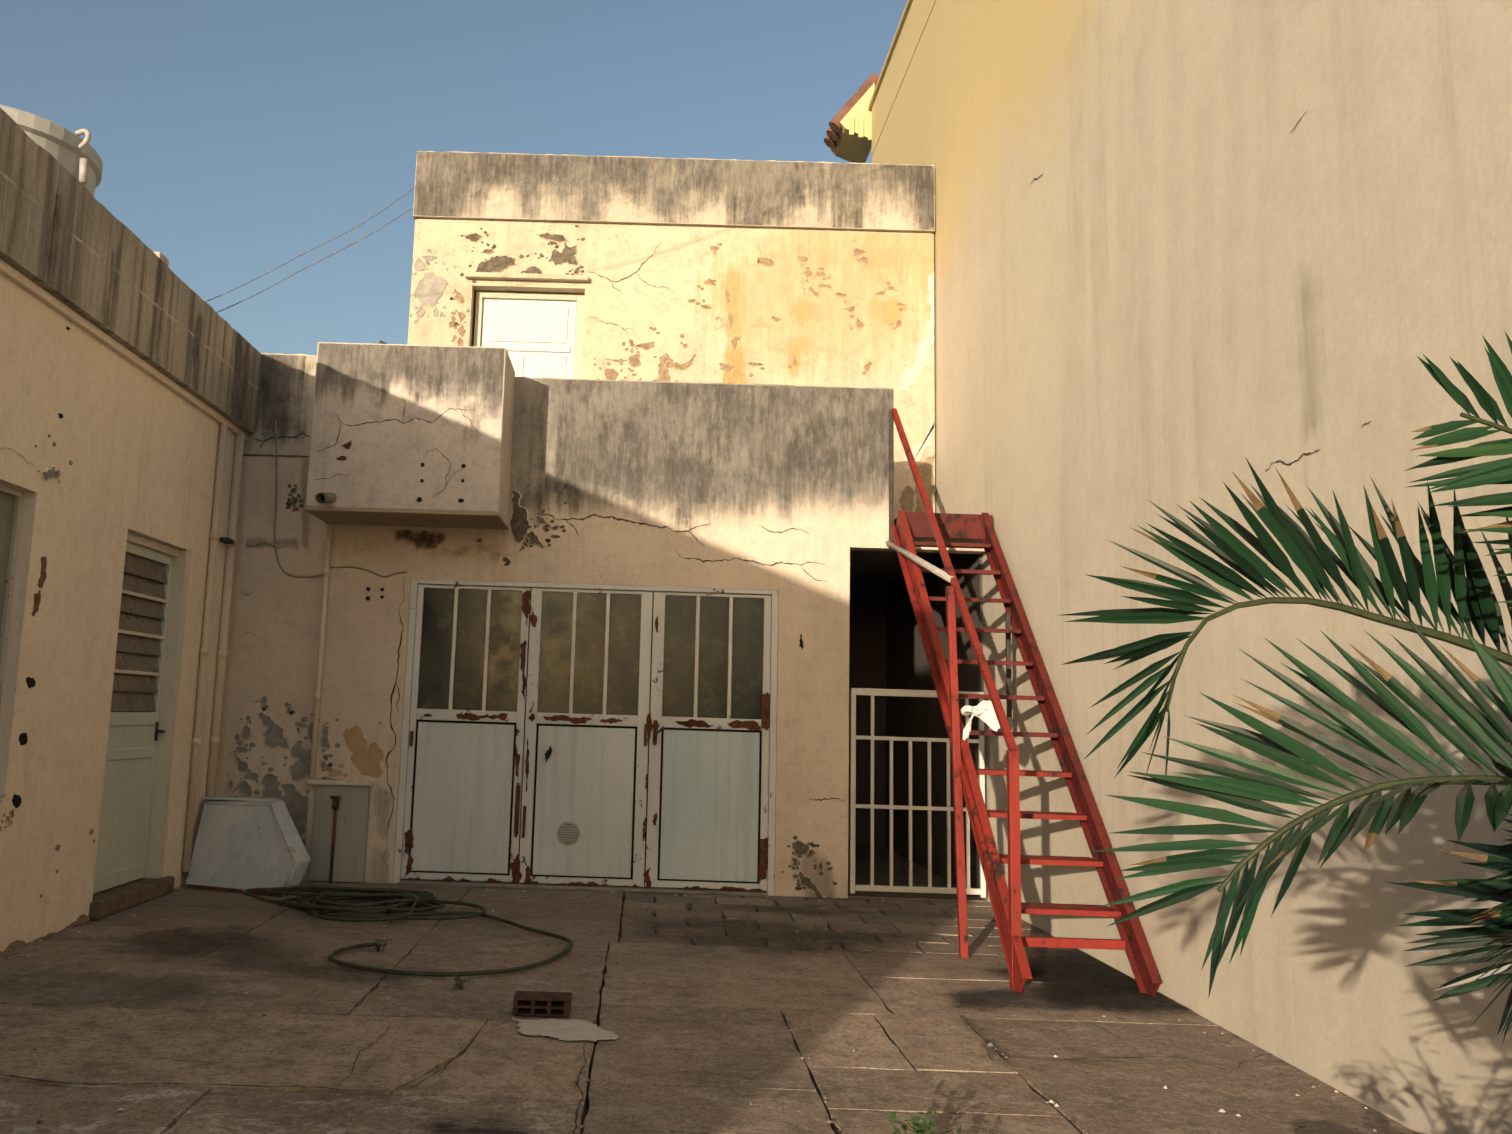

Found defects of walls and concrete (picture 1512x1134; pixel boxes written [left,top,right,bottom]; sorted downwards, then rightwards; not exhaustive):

water stain [414,151,934,230]
water stain [0,195,505,440]
peeling [410,223,585,346]
crack [589,242,674,331]
peeling [594,326,697,382]
crack [255,398,478,498]
water stain [522,379,894,524]
crack [529,514,827,581]
rust [675,719,761,731]
peeling [227,695,387,846]
rust [404,828,539,884]
rust [684,864,767,891]